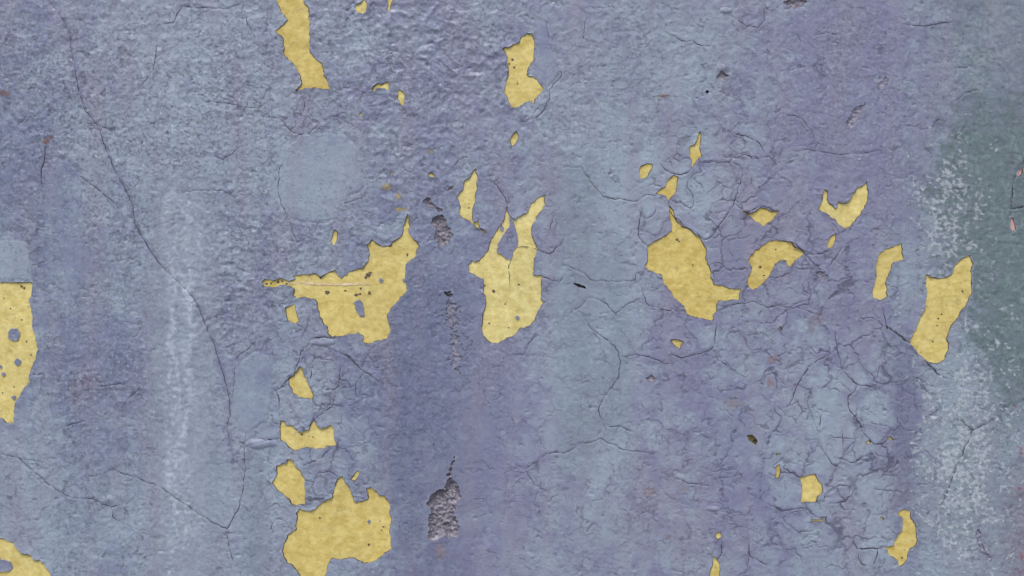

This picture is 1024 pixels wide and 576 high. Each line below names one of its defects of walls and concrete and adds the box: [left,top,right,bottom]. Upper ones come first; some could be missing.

peeling [0,282,38,423]
crack [7,2,382,560]
peeling [272,420,392,576]
peeling [262,214,420,344]
peeling [446,169,546,344]
crack [508,216,803,491]
crack [563,133,777,243]
peeling [645,175,804,321]
crack [770,310,947,533]
crack [853,540,886,565]
peeling [909,255,973,364]
crack [943,420,989,501]